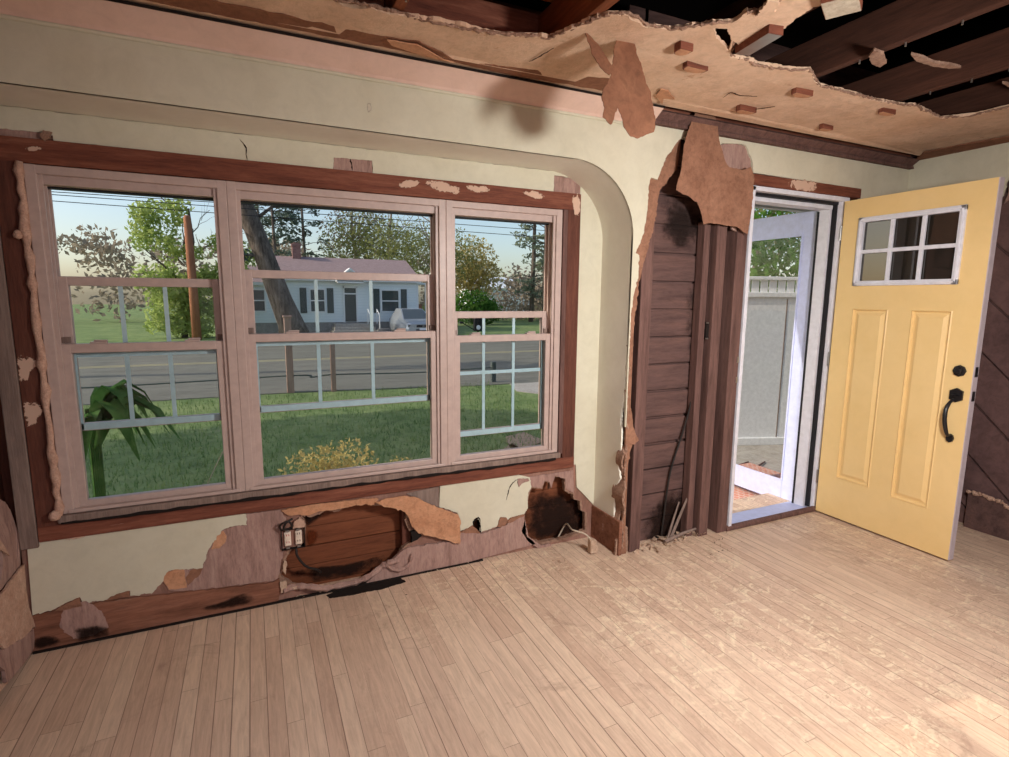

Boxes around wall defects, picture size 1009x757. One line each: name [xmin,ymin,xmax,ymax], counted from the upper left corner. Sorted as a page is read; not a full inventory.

spalling [333,0,731,40]
spalling [747,0,781,16]
spalling [730,41,1009,119]
flaking render [333,158,372,173]
spalling [611,139,681,555]
spalling [497,470,587,548]
flaking render [163,487,481,598]
flaking render [0,499,35,692]
leakage [34,637,58,648]
flaking render [53,591,130,639]
leakage [76,626,107,640]
leakage [206,595,249,609]